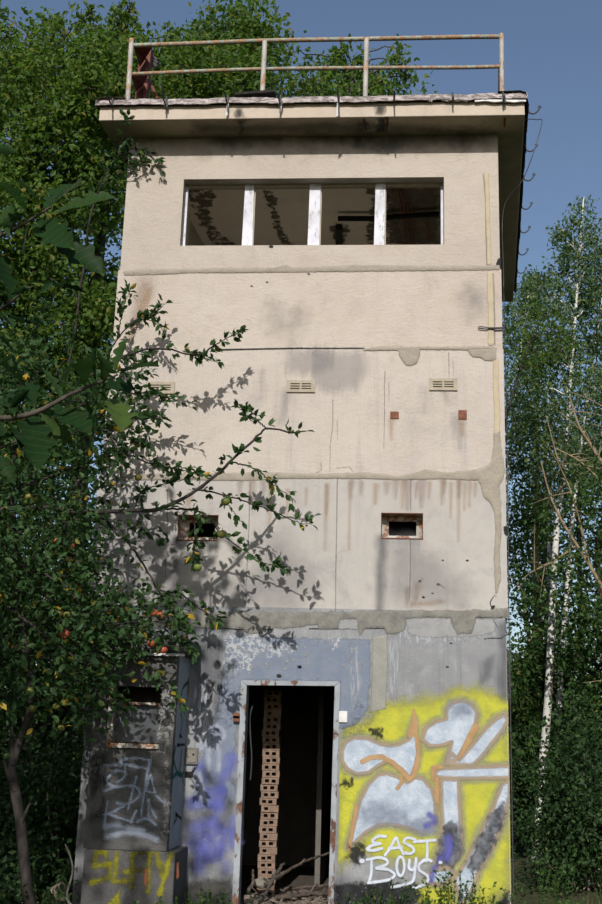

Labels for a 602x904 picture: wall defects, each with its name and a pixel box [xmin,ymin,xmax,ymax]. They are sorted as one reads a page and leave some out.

peeling [189,619,371,811]
flaking render [388,605,496,693]